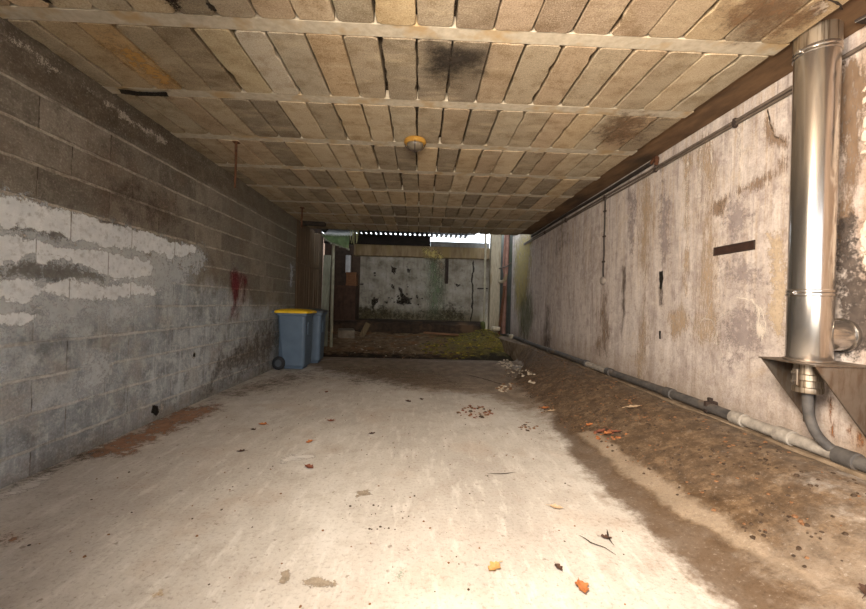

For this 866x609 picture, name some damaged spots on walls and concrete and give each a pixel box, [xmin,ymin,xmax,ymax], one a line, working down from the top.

leakage [721,0,825,41]
leakage [592,113,654,144]
peeling [0,187,207,339]
crack [468,261,476,321]